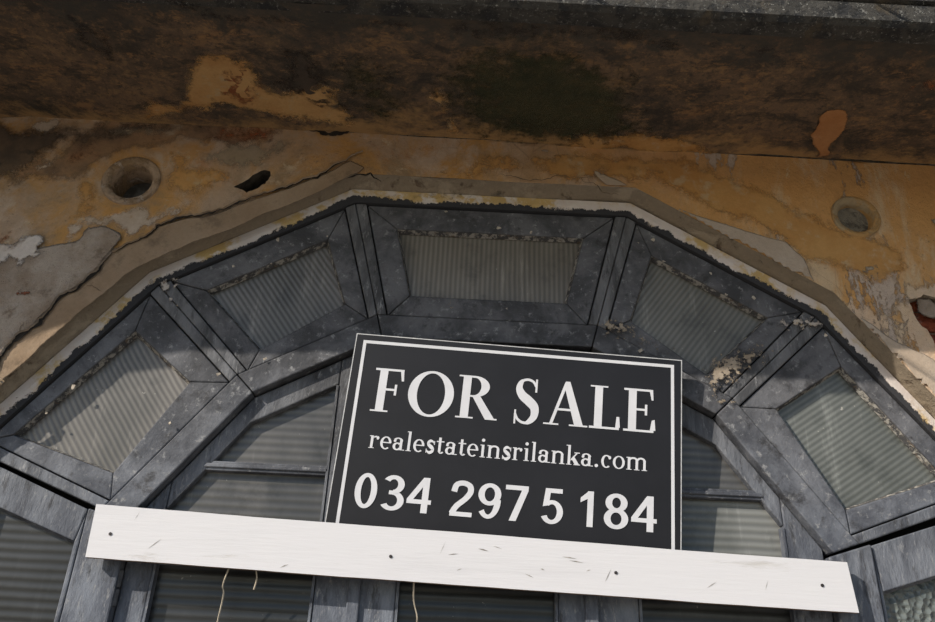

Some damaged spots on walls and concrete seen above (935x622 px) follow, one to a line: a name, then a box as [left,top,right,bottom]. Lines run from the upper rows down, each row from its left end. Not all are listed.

water stain [277,51,347,112]
water stain [432,22,640,147]
water stain [0,121,286,184]
spalling [0,161,364,379]
crack [0,130,381,360]
spalling [675,207,814,281]
spalling [861,318,935,394]
flaking render [909,294,935,343]